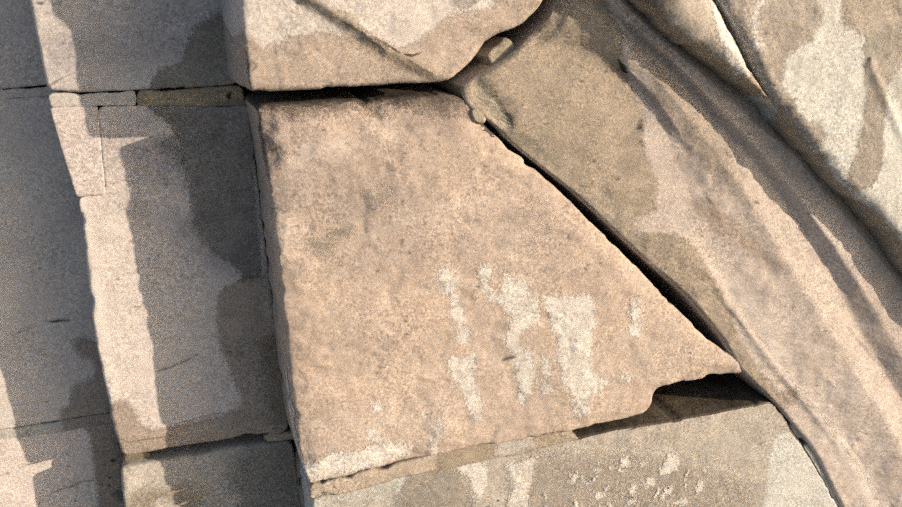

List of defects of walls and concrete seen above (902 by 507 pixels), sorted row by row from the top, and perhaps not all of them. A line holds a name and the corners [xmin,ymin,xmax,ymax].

damp [61,105,414,507]
damp [148,0,542,91]
damp [335,0,813,507]
damp [626,0,902,276]